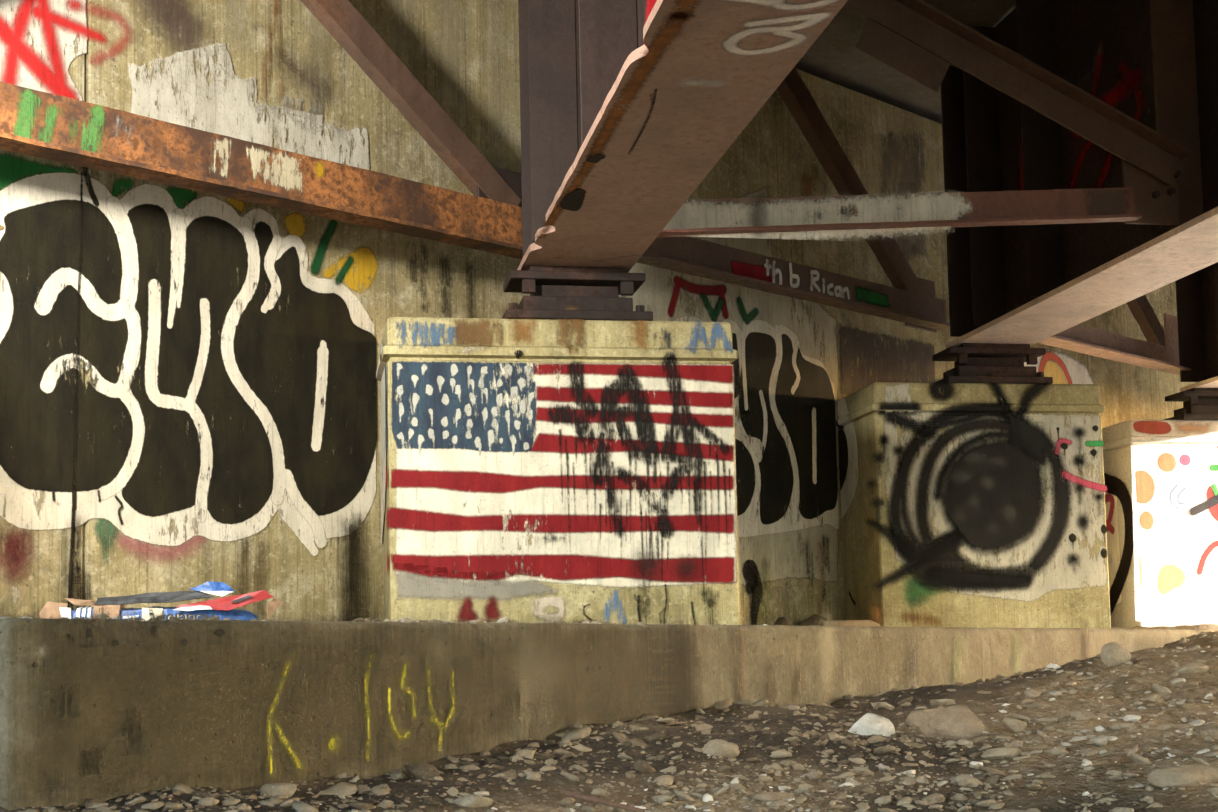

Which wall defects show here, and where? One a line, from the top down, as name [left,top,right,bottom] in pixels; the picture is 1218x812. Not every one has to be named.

rust [537,0,701,238]